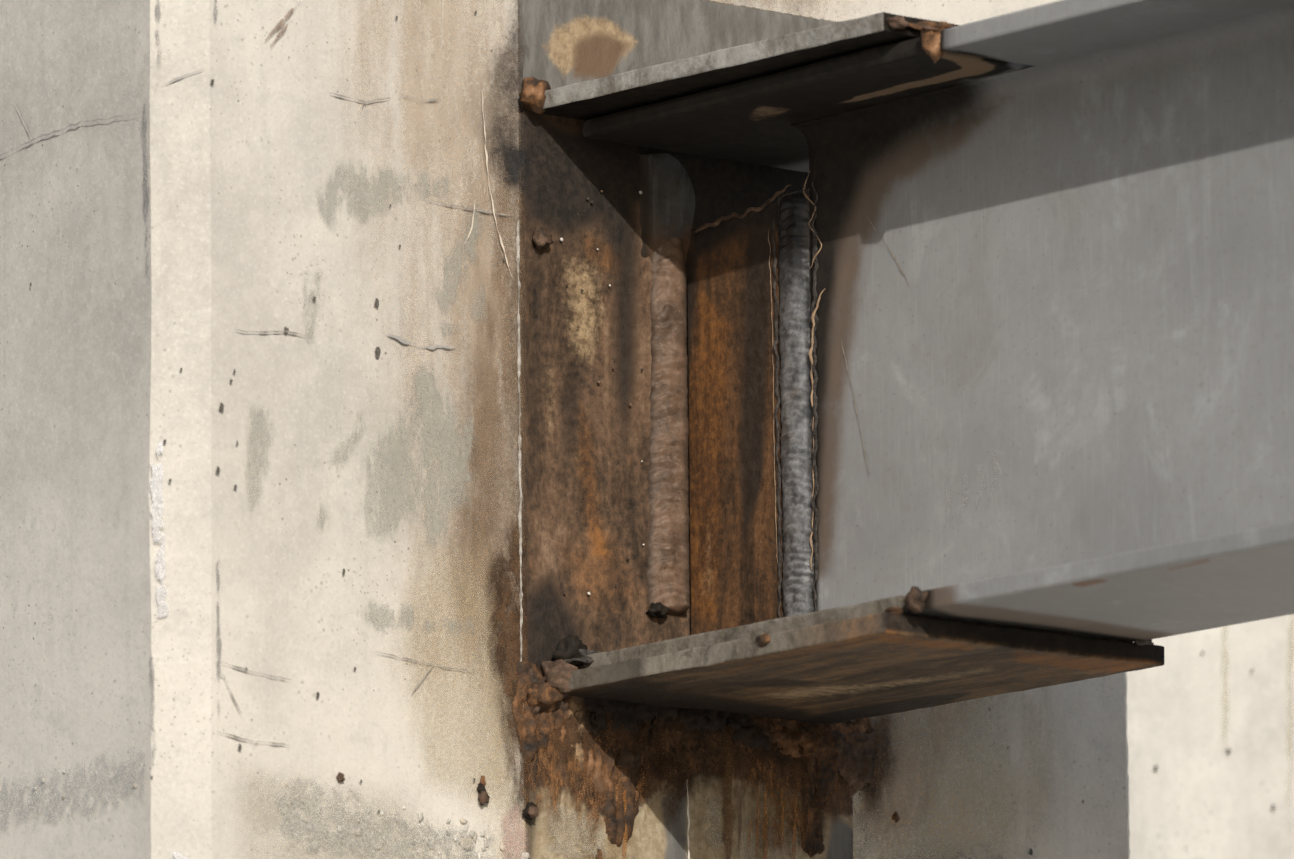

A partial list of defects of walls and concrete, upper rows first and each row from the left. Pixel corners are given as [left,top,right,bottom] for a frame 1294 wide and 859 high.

damp [404,0,509,640]
rust [459,168,875,859]